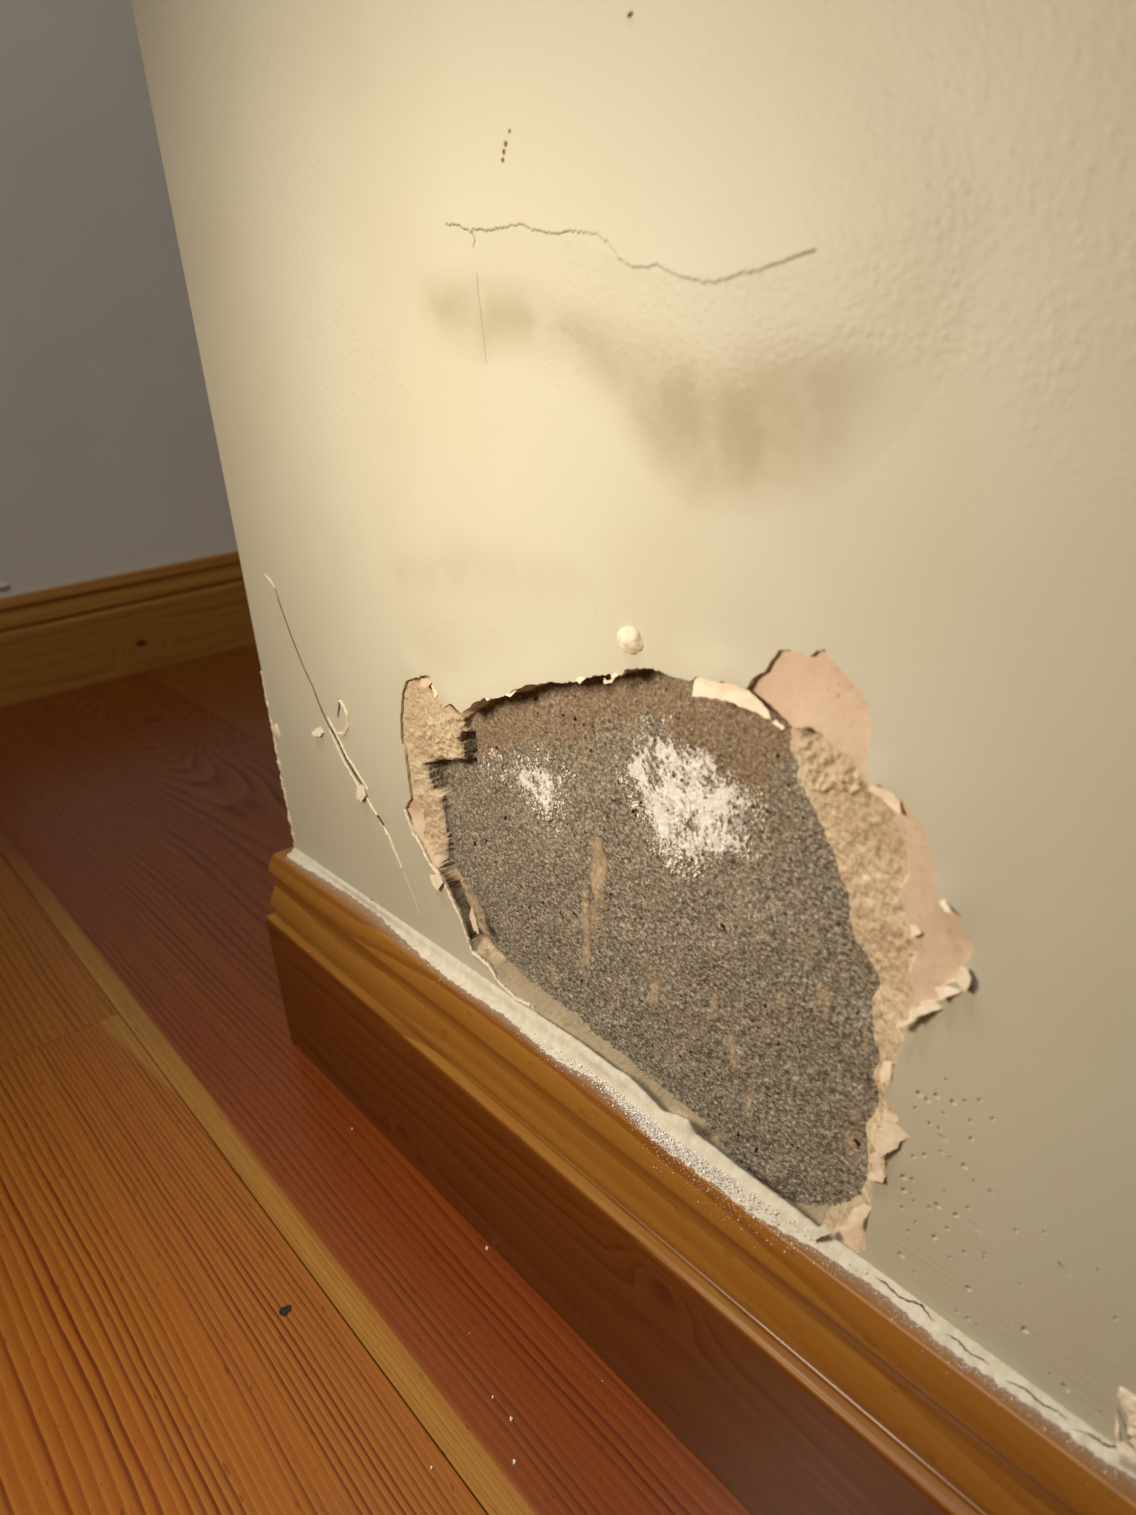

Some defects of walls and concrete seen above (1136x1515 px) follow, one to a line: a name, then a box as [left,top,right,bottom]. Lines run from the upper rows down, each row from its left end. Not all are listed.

crack [443,200,817,284]
spalling [402,649,995,1251]
peeling [1099,1387,1136,1463]